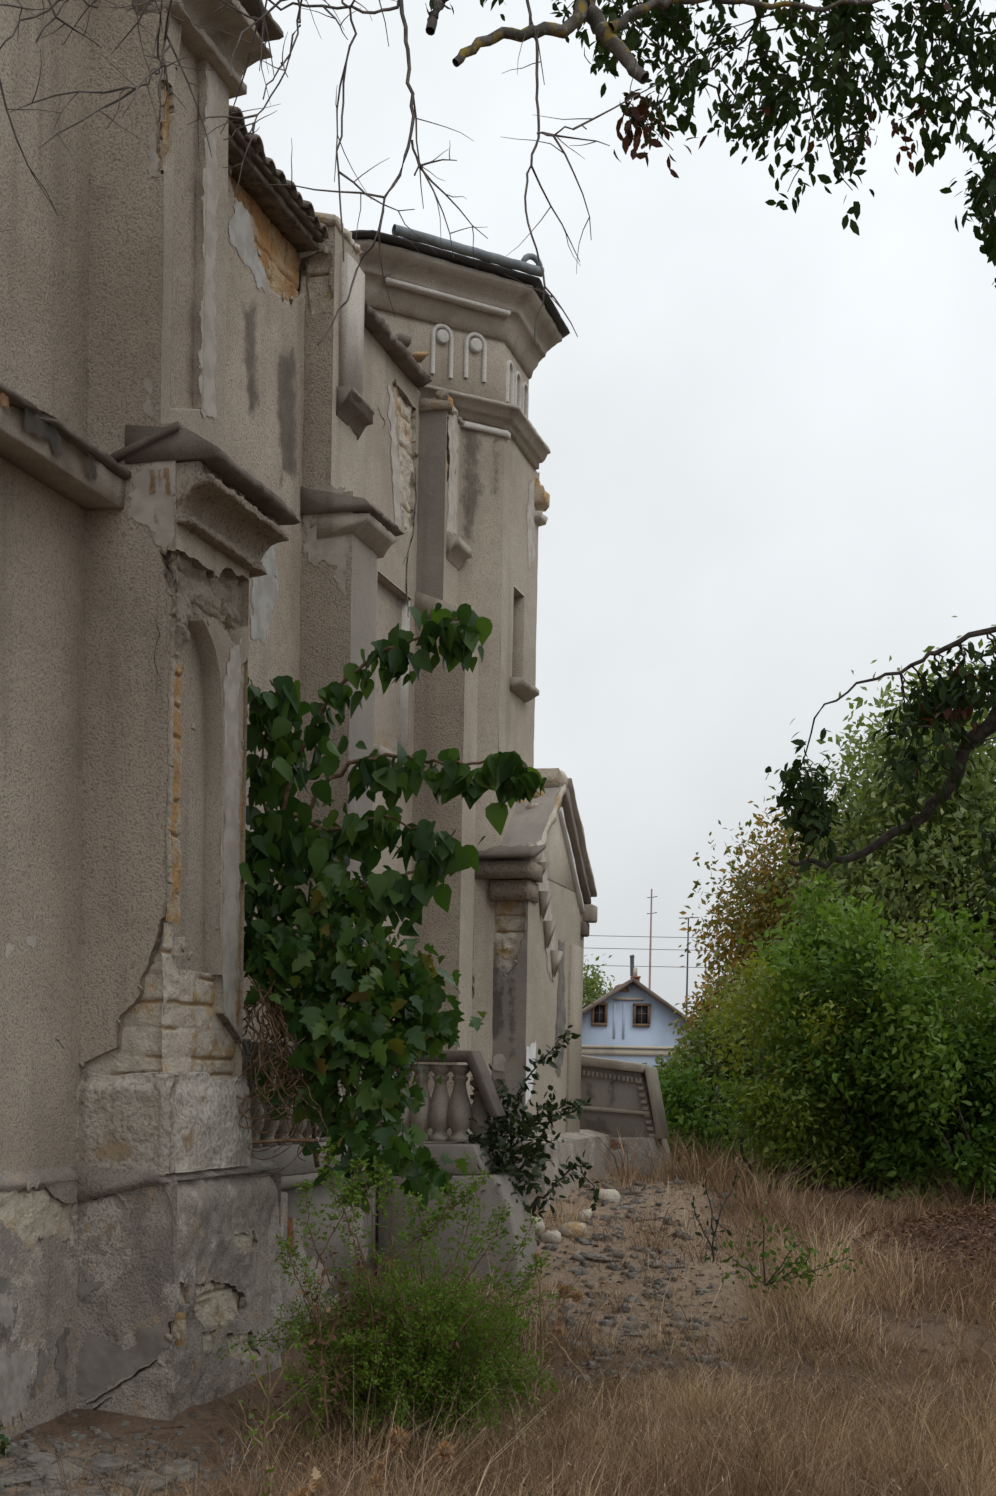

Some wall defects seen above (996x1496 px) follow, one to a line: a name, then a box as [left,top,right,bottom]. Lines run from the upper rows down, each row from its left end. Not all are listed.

peeling [198,65,333,419]
spalling [388,379,419,533]
spalling [78,460,279,1080]
spalling [495,851,555,982]
spalling [0,1180,72,1242]
crack [86,1358,164,1410]
spalling [164,1275,259,1365]